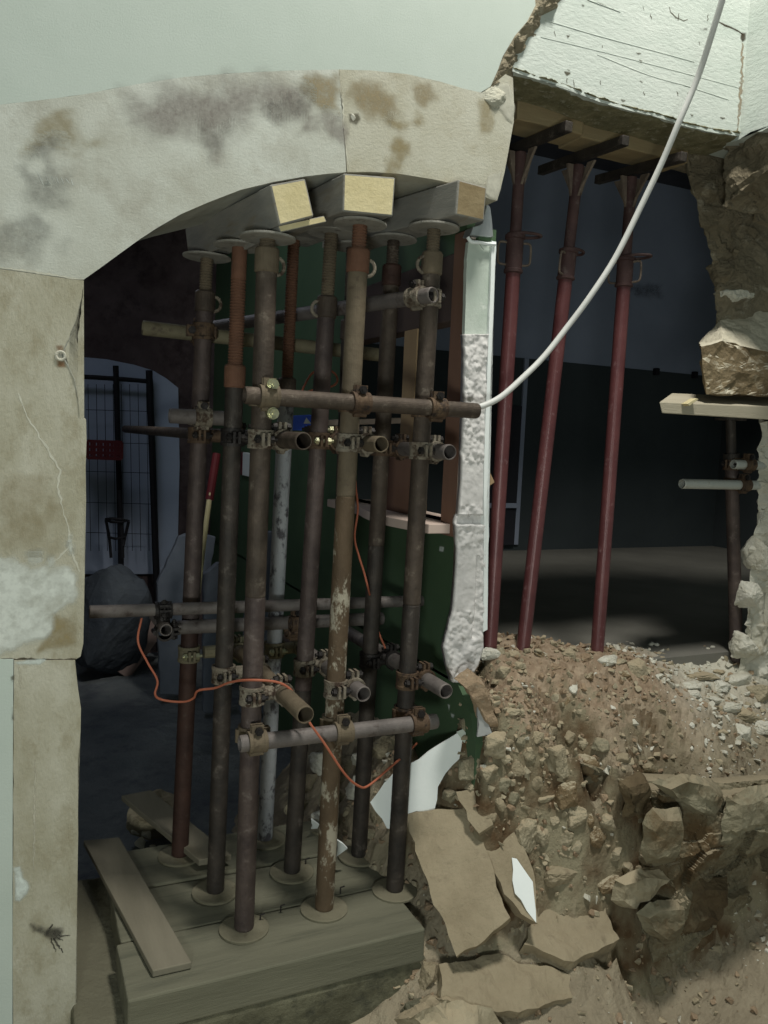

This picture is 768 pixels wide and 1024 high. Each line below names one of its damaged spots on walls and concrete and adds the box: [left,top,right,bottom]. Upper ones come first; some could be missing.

water stain [263,78,336,108]
spalling [481,0,741,156]
crack [18,393,80,572]